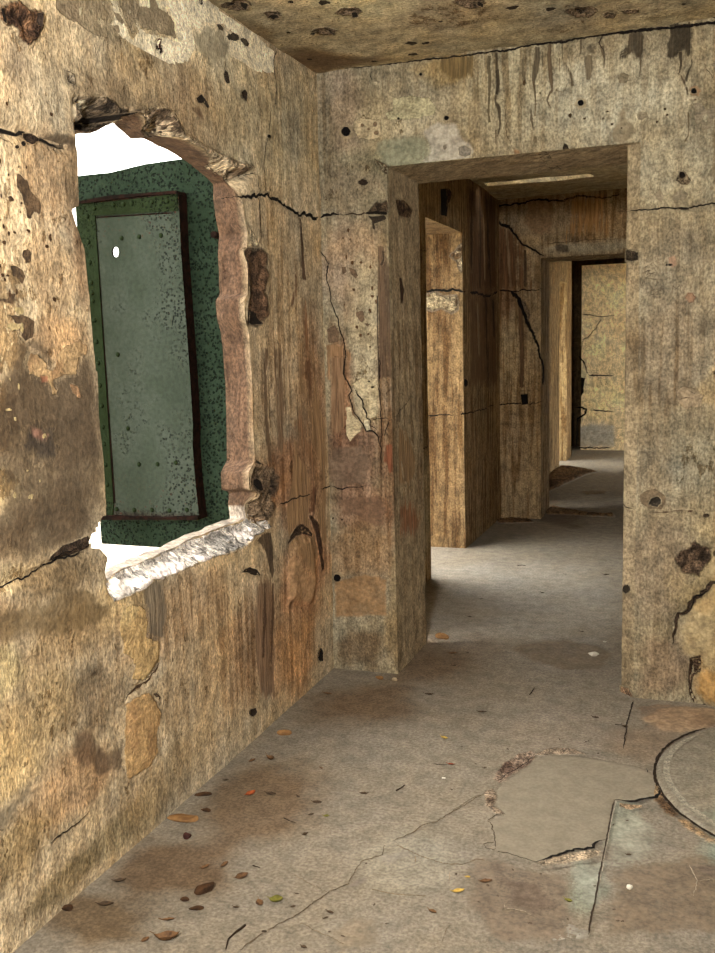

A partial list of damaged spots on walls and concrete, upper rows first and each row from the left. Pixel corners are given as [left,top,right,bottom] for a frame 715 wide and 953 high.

crack [0,121,76,156]
peeling [0,0,178,49]
spalling [218,0,294,20]
spalling [317,0,365,19]
water stain [433,51,502,144]
crack [345,17,715,85]
water stain [520,29,647,130]
water stain [664,20,697,142]
spalling [244,219,271,331]
crack [221,49,413,504]
water stain [0,326,106,570]
crack [0,535,90,588]